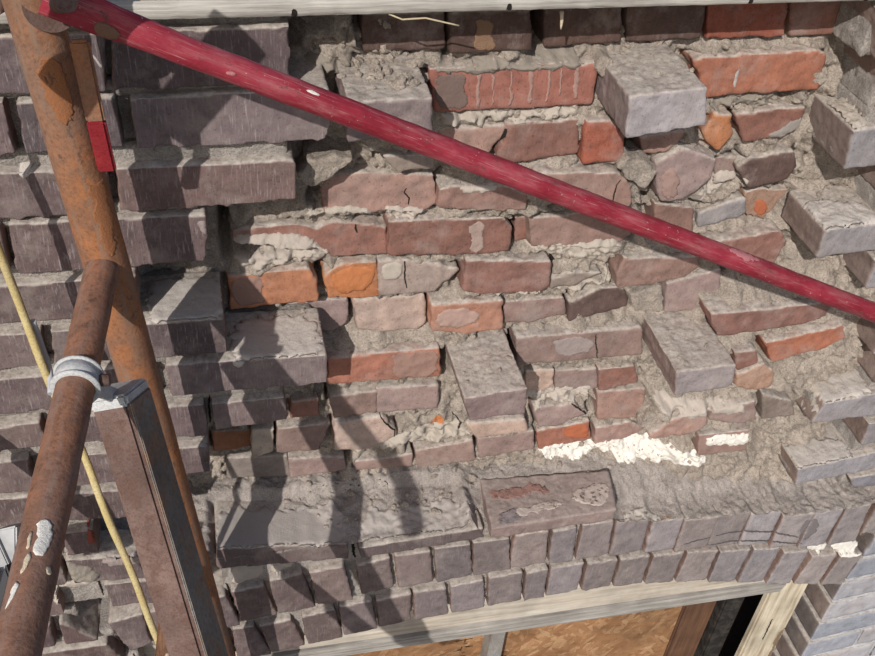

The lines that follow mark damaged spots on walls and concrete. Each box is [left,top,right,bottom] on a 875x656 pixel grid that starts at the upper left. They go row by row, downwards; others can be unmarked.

spalling [304,51,347,78]
spalling [767,118,802,138]
spalling [332,266,375,294]
peeling [435,308,480,329]
peeling [553,336,594,357]